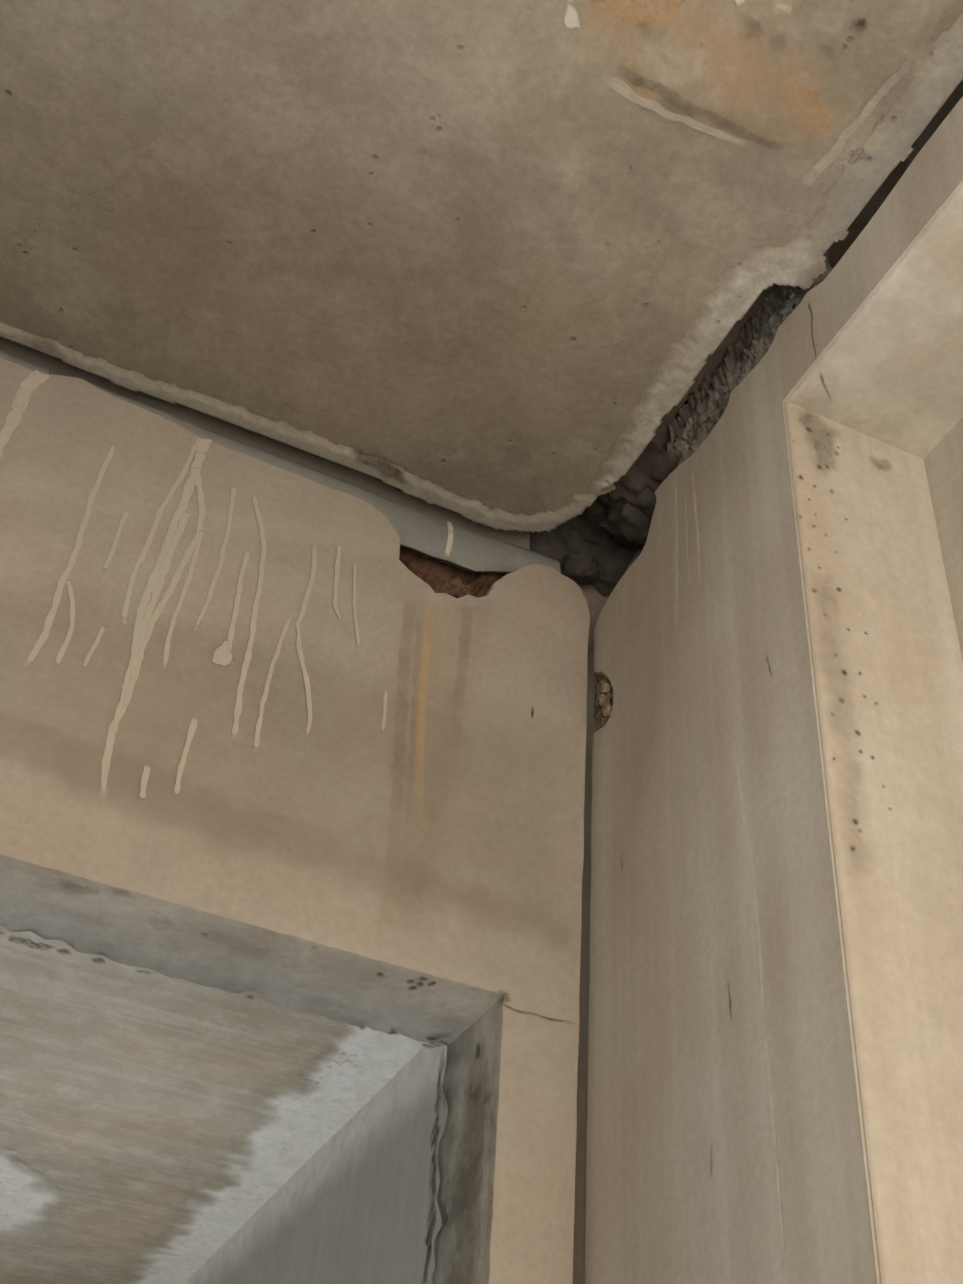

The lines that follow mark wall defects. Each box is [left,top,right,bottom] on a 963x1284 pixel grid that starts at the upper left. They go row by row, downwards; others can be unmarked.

corrosion [564,0,580,28]
leakage [0,370,50,459]
spalling [529,247,833,596]
leakage [27,445,115,667]
leakage [101,437,212,798]
leakage [212,496,267,735]
leakage [254,547,317,748]
spalling [399,547,503,598]
leakage [0,1147,68,1241]